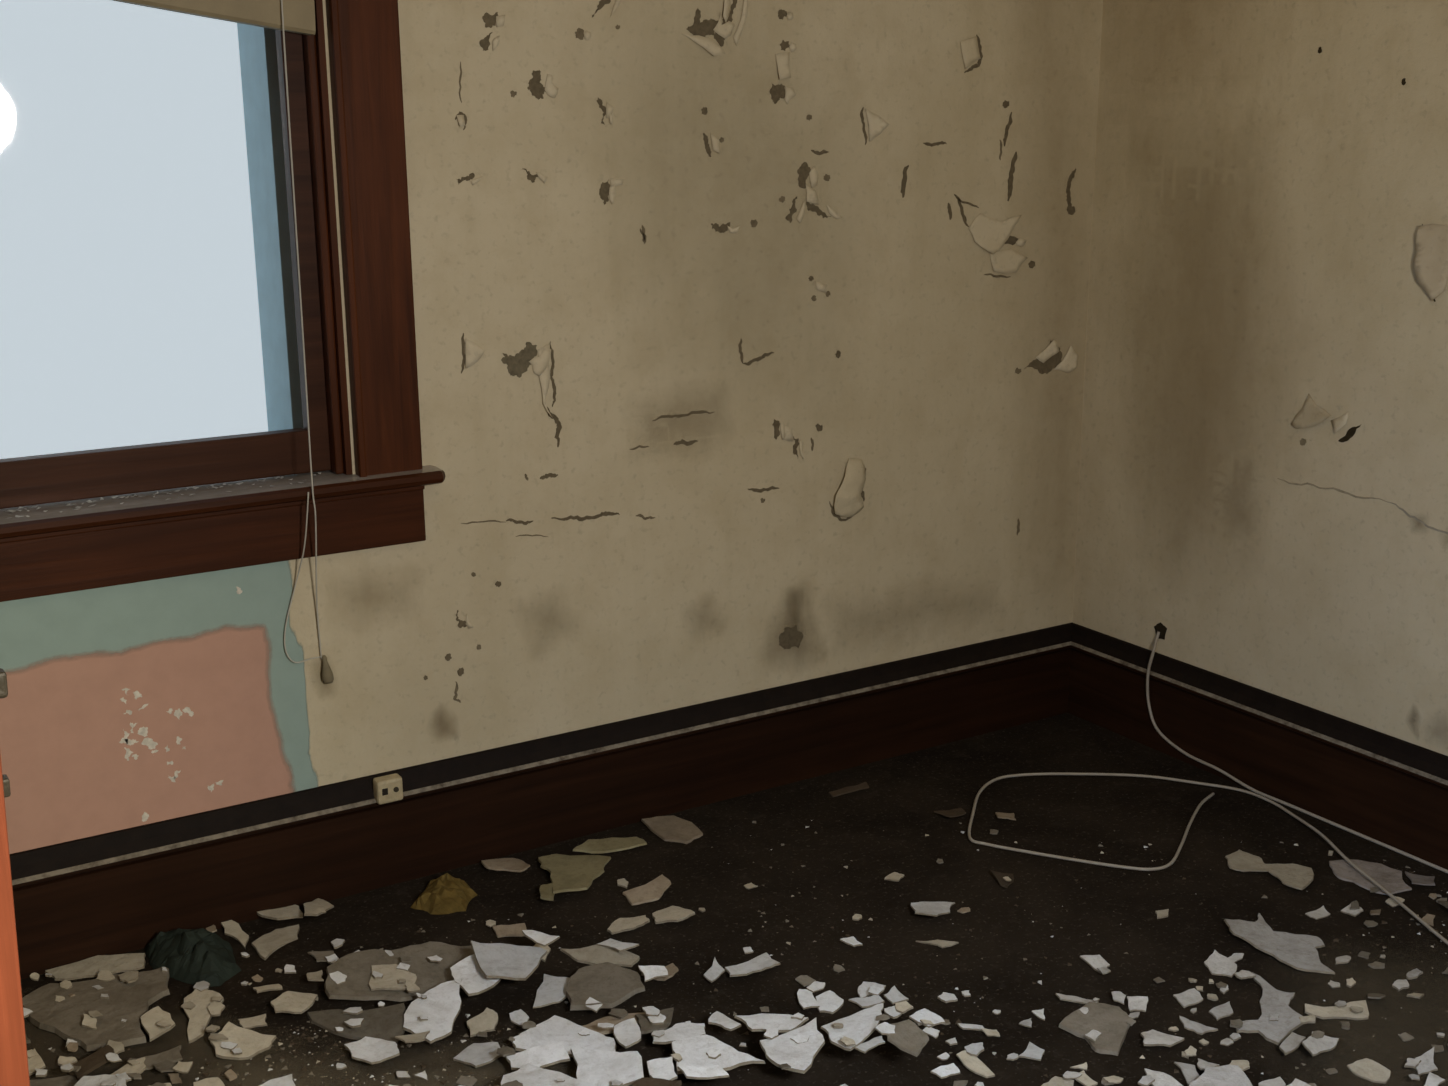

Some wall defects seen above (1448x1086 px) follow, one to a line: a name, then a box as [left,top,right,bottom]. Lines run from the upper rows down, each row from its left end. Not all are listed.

spalling [479,12,505,51]
spalling [575,0,621,40]
peeling [683,0,748,56]
spalling [510,70,559,100]
peeling [770,40,797,104]
peeling [599,178,625,205]
peeling [779,150,842,223]
peeling [947,194,1035,278]
spalling [738,338,774,366]
peeling [1015,339,1079,374]
peeling [501,342,562,447]
flaking render [0,560,318,854]